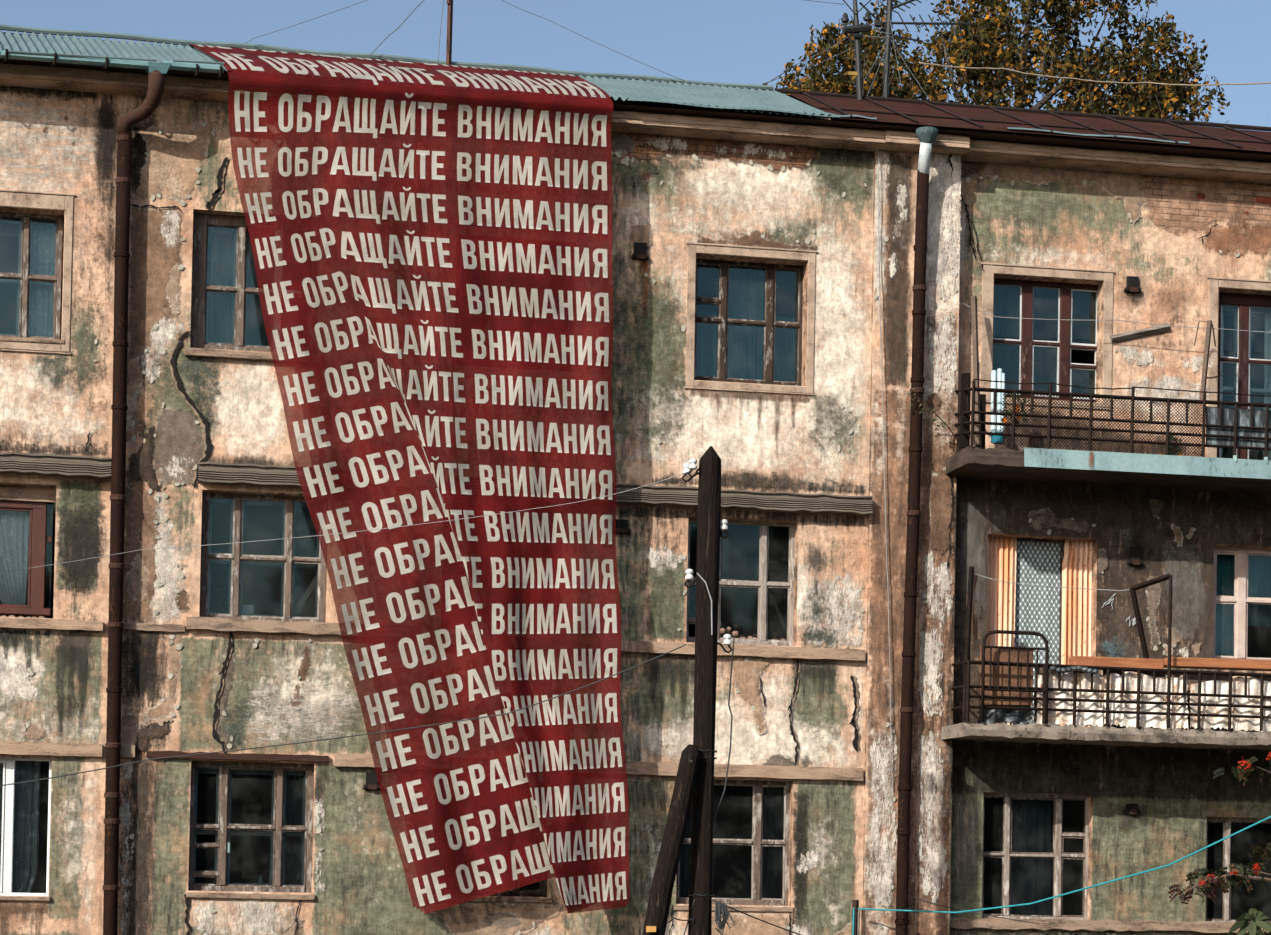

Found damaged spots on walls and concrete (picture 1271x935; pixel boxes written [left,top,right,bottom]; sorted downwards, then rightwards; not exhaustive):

flaking render [611,132,908,301]
crack [946,154,984,272]
flaking render [924,153,1271,411]
crack [168,331,213,488]
water stain [721,472,864,494]
water stain [56,502,105,595]
water stain [122,631,162,703]
crack [212,632,233,754]
crack [759,660,801,766]
crack [849,675,860,751]